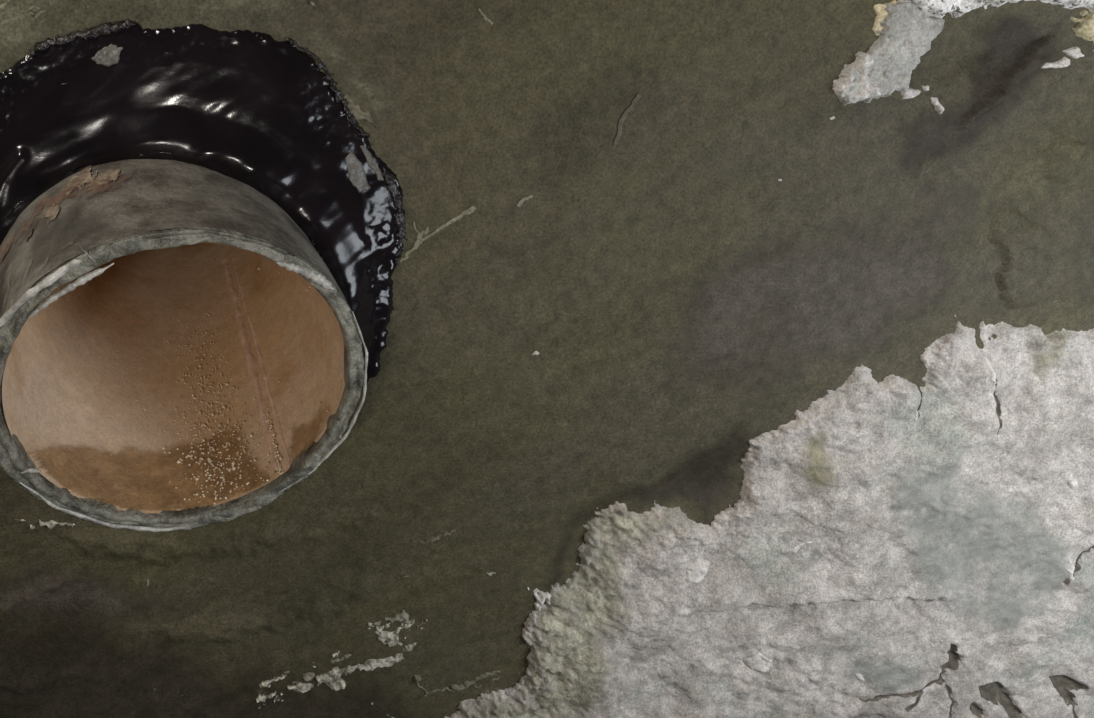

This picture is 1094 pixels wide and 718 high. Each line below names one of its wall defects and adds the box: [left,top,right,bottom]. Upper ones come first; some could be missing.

spalling [832,0,1094,114]
crack [993,379,1002,435]
spalling [414,315,1094,718]
crack [1063,545,1094,585]
crack [859,668,955,718]